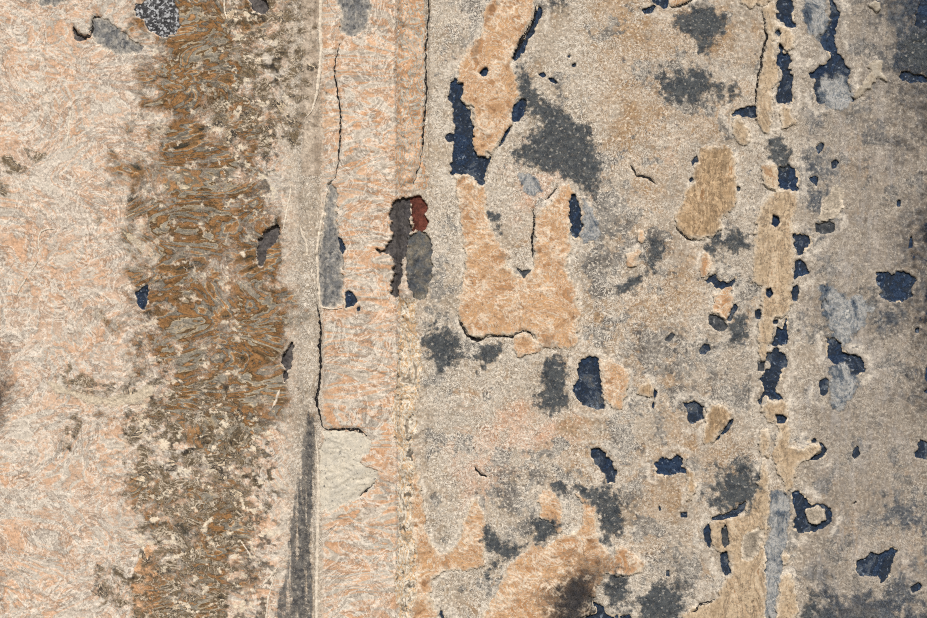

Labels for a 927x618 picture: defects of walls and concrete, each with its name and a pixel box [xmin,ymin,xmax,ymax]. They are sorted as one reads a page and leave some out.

damp [199,76,280,166]
crack [329,44,342,185]
spalling [376,196,433,300]
crack [413,0,430,184]
peeling [445,0,584,358]
peeling [674,0,797,241]
crack [314,305,367,436]
peeling [573,356,657,410]
peeling [682,164,832,618]
damp [293,430,313,618]
peeling [481,489,644,618]
damp [556,578,593,618]